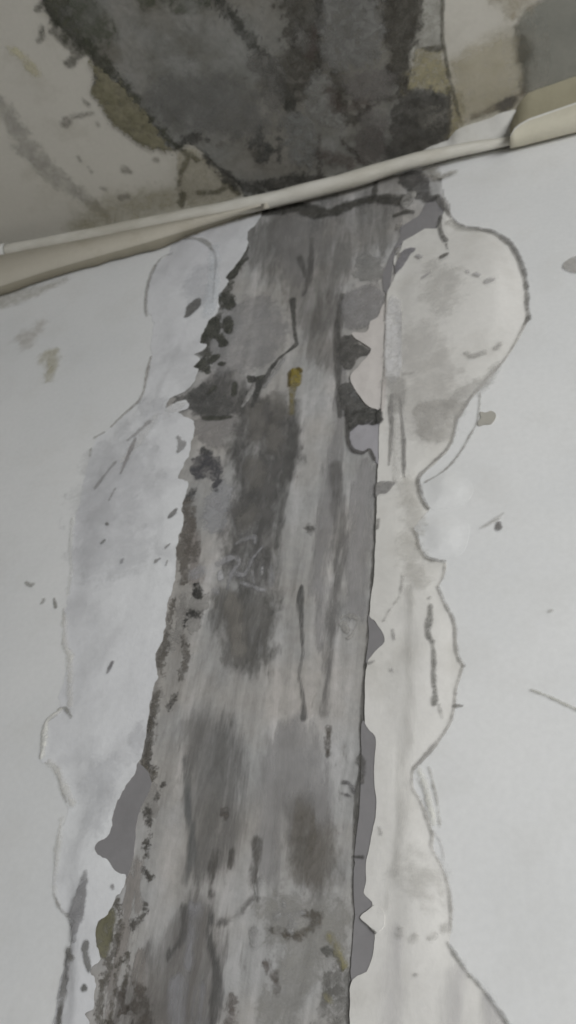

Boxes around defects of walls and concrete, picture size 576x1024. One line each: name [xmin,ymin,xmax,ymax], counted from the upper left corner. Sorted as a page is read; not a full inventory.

damp [39,27,241,208]
peeling [41,173,451,1024]
damp [56,948,73,1024]
damp [96,908,115,958]